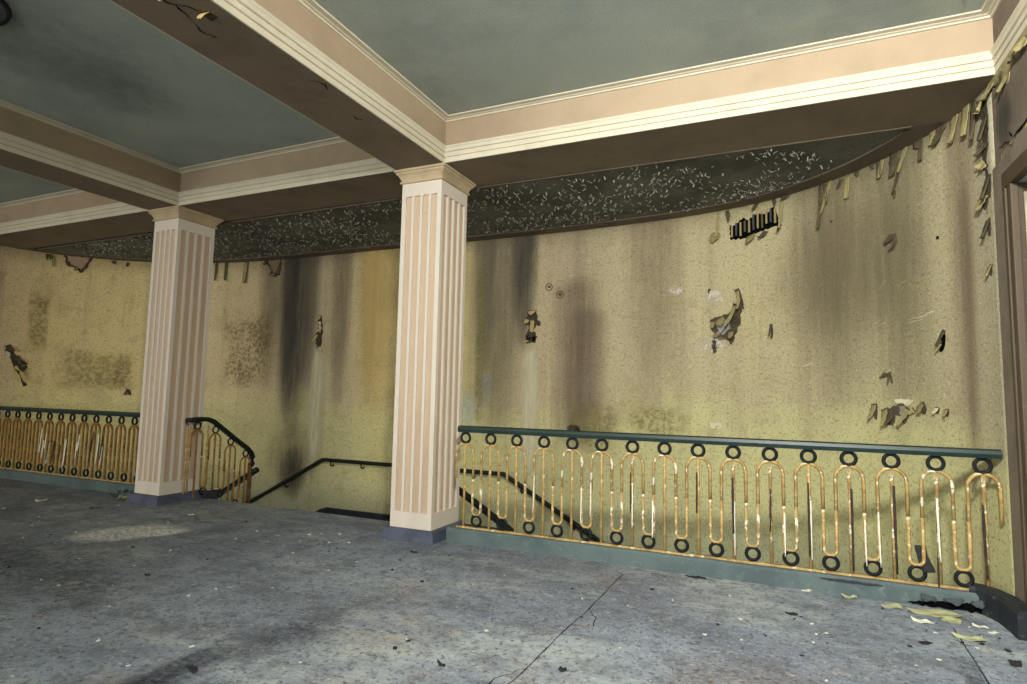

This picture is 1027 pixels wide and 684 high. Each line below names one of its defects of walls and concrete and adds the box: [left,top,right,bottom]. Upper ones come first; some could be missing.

crack [163,0,219,39]
peeling [466,26,1027,243]
damp [515,235,535,323]
peeling [5,344,28,387]
damp [284,257,322,461]
peeling [524,310,541,344]
peeling [708,288,744,354]
peeling [934,329,946,352]
damp [523,350,537,472]
peeling [866,399,950,426]
crack [488,573,653,684]
crack [953,628,1005,684]